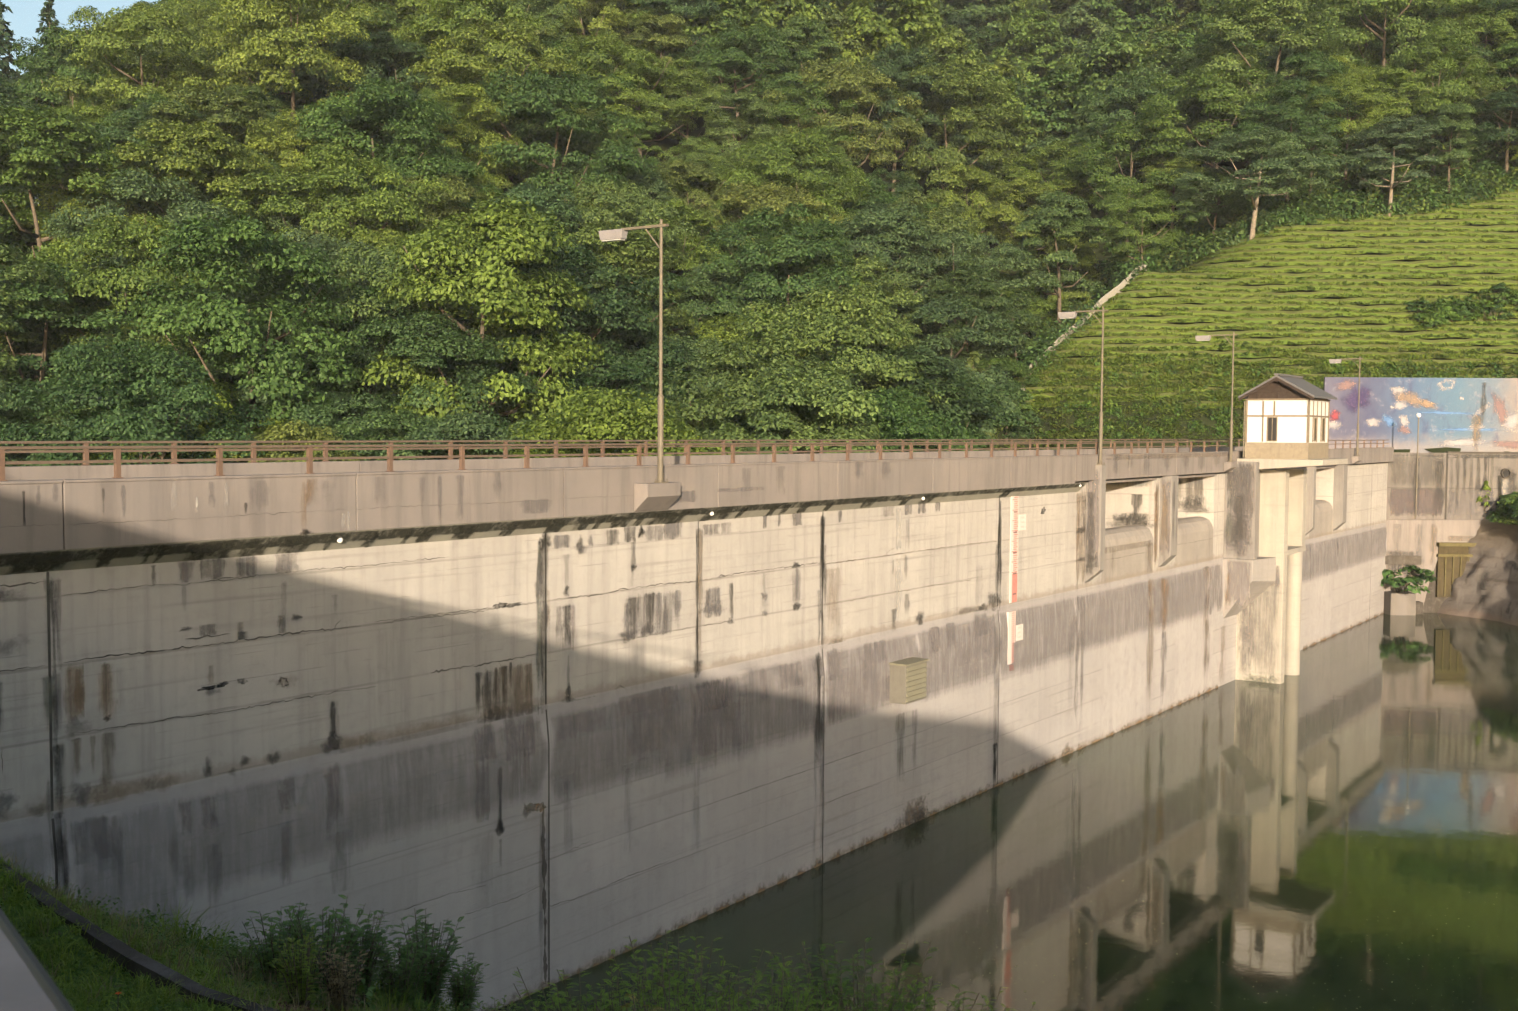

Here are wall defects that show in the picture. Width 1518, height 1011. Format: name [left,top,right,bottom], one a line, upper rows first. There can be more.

water stain [0,466,1254,835]